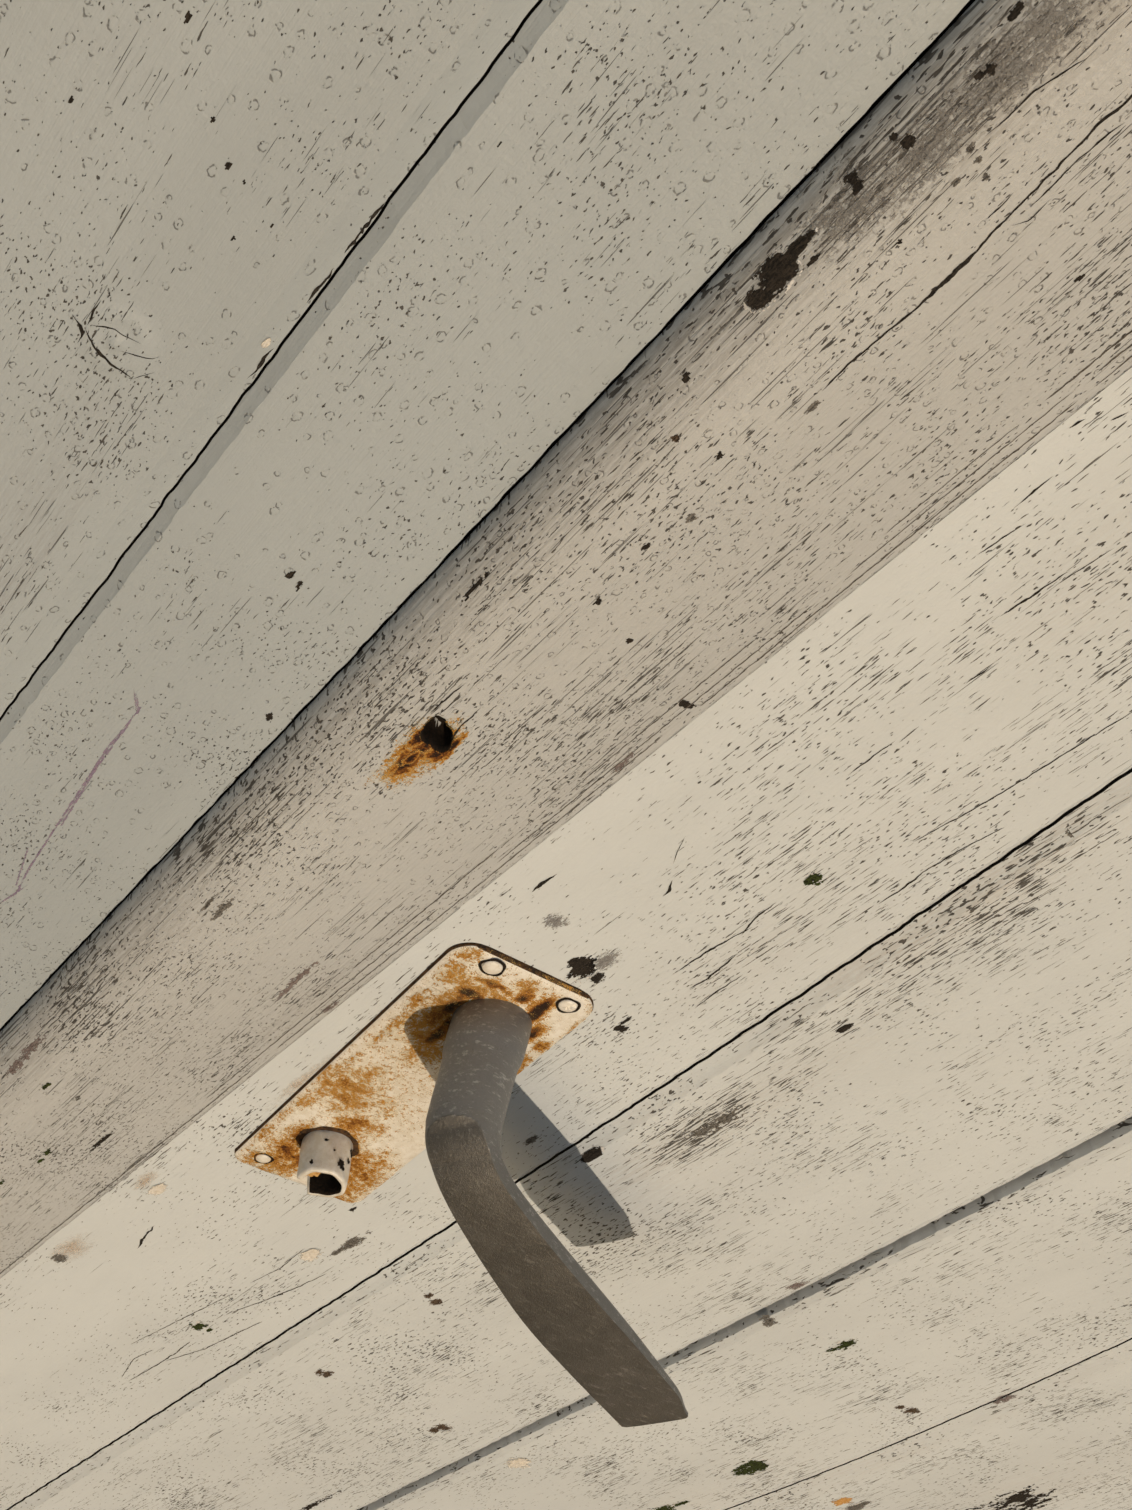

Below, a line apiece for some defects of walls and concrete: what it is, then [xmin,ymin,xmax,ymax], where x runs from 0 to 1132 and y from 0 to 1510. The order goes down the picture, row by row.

crack [988,58,1087,134]
peeling [743,227,821,313]
crack [826,95,1132,387]
corrosion [367,713,469,789]
peeling [564,955,606,985]
corrosion [237,946,592,1203]
peeling [966,1486,1083,1510]